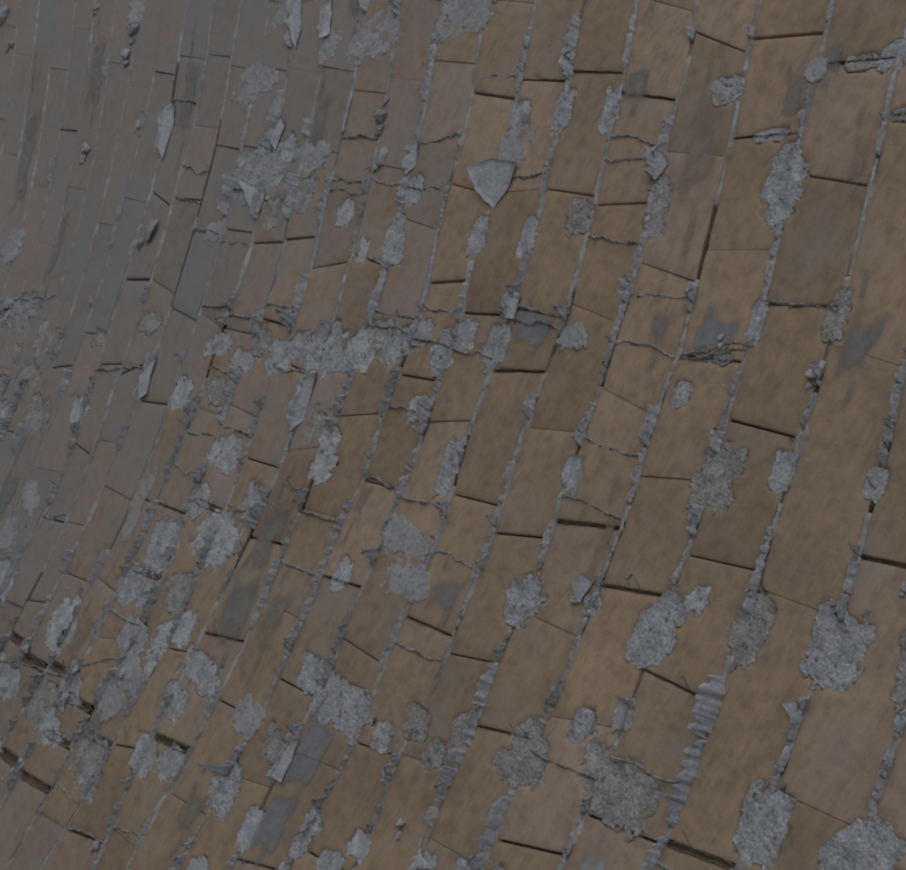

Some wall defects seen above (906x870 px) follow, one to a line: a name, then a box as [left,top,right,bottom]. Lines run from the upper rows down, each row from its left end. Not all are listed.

crack [523,70,675,101]
spalling [203,282,522,435]
crack [557,520,662,596]
crack [861,555,906,569]
crack [10,573,111,760]
spalling [624,575,712,675]
spalling [781,598,876,717]
spalling [296,651,402,776]
crack [0,747,50,794]
crack [666,832,735,869]
spalling [729,778,802,870]
spalling [817,812,906,870]